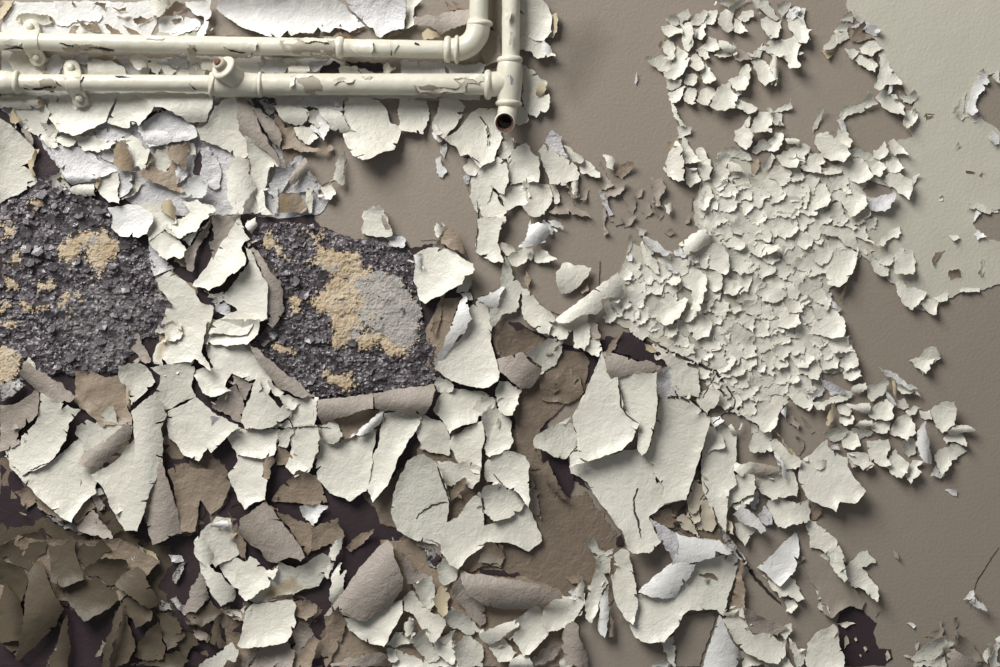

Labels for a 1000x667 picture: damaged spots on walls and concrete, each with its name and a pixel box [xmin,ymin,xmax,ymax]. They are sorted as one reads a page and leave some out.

peeling [0,0,501,89]
peeling [508,65,550,126]
peeling [509,0,560,59]
peeling [642,9,718,138]
peeling [696,64,793,150]
peeling [689,0,812,86]
peeling [821,10,883,59]
peeling [845,48,878,72]
peeling [874,52,918,128]
peeling [896,279,949,315]
flaking render [0,91,922,667]
peeling [919,401,975,478]